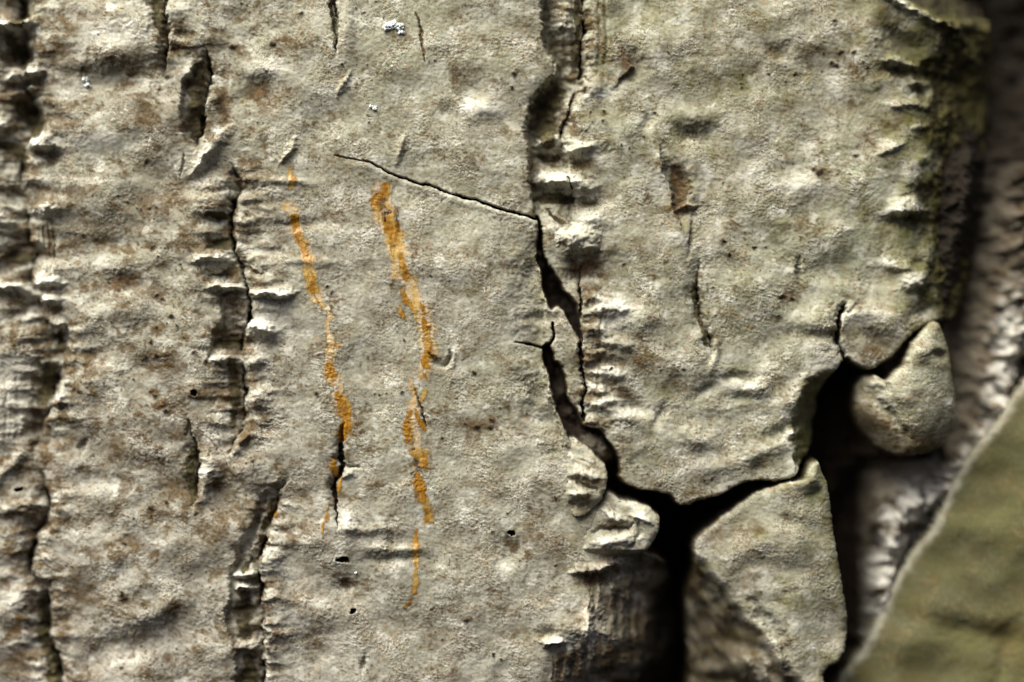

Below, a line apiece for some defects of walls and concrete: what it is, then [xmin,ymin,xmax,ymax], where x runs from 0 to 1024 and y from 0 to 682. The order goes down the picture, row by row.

crack [204,176,253,428]
crack [330,440,345,530]
crack [515,246,762,682]
crack [807,304,934,682]